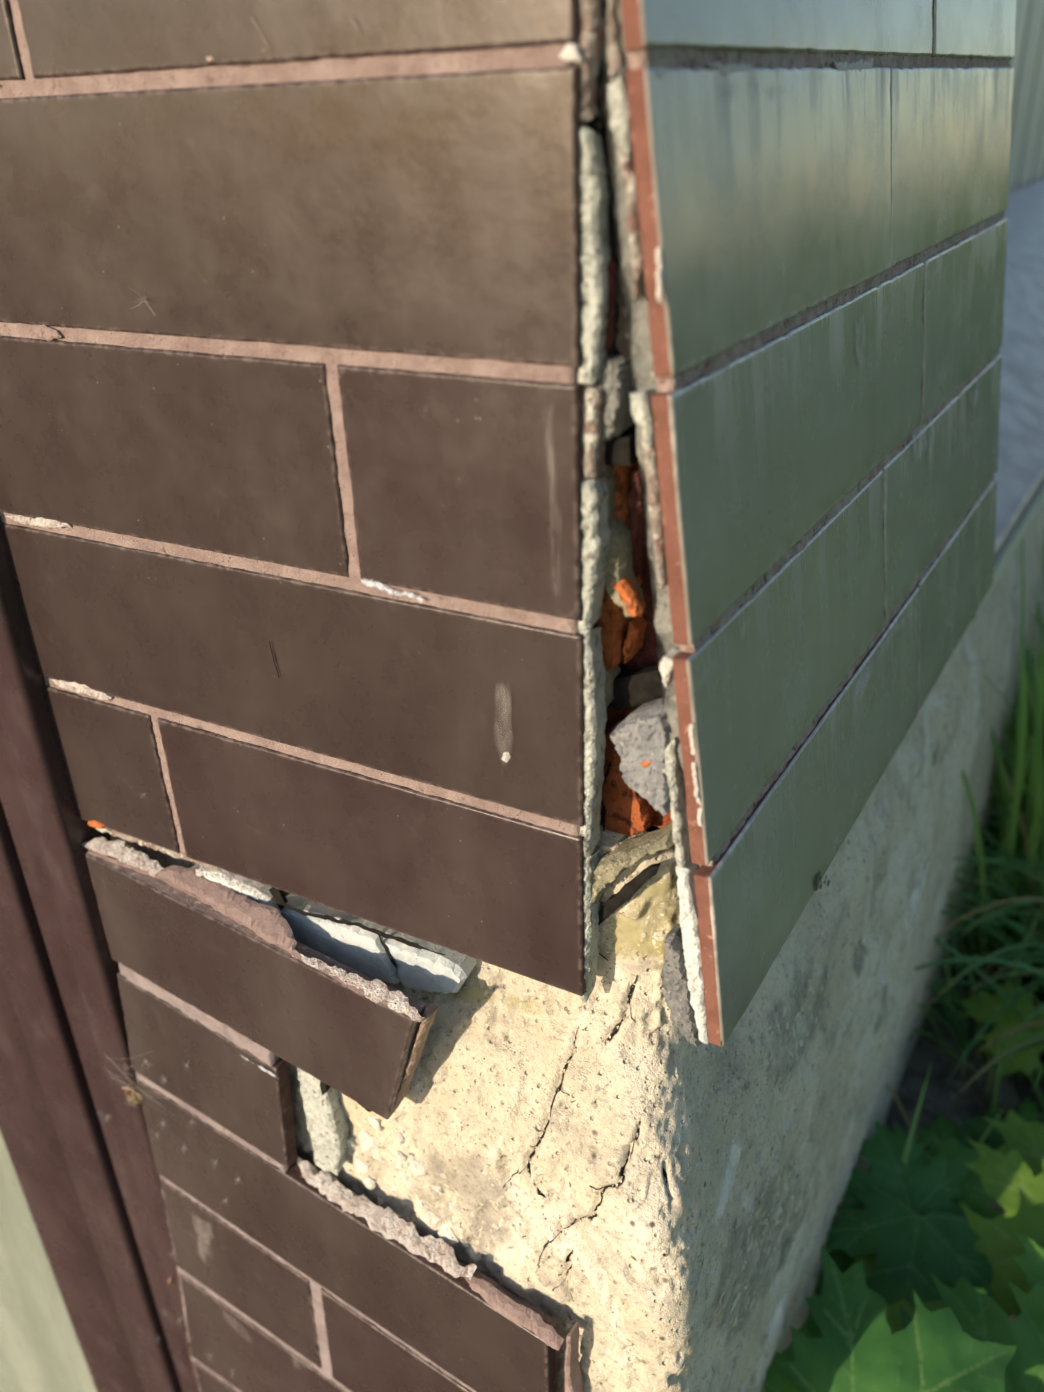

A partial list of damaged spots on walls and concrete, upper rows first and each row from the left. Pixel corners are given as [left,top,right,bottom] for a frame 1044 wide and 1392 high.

crack [600,0,608,20]
crack [589,56,629,363]
peeling [655,247,664,304]
crack [605,430,639,466]
crack [609,665,662,711]
peeling [689,723,703,827]
crack [598,863,661,961]
spalling [343,1117,469,1250]
crack [502,977,640,1298]